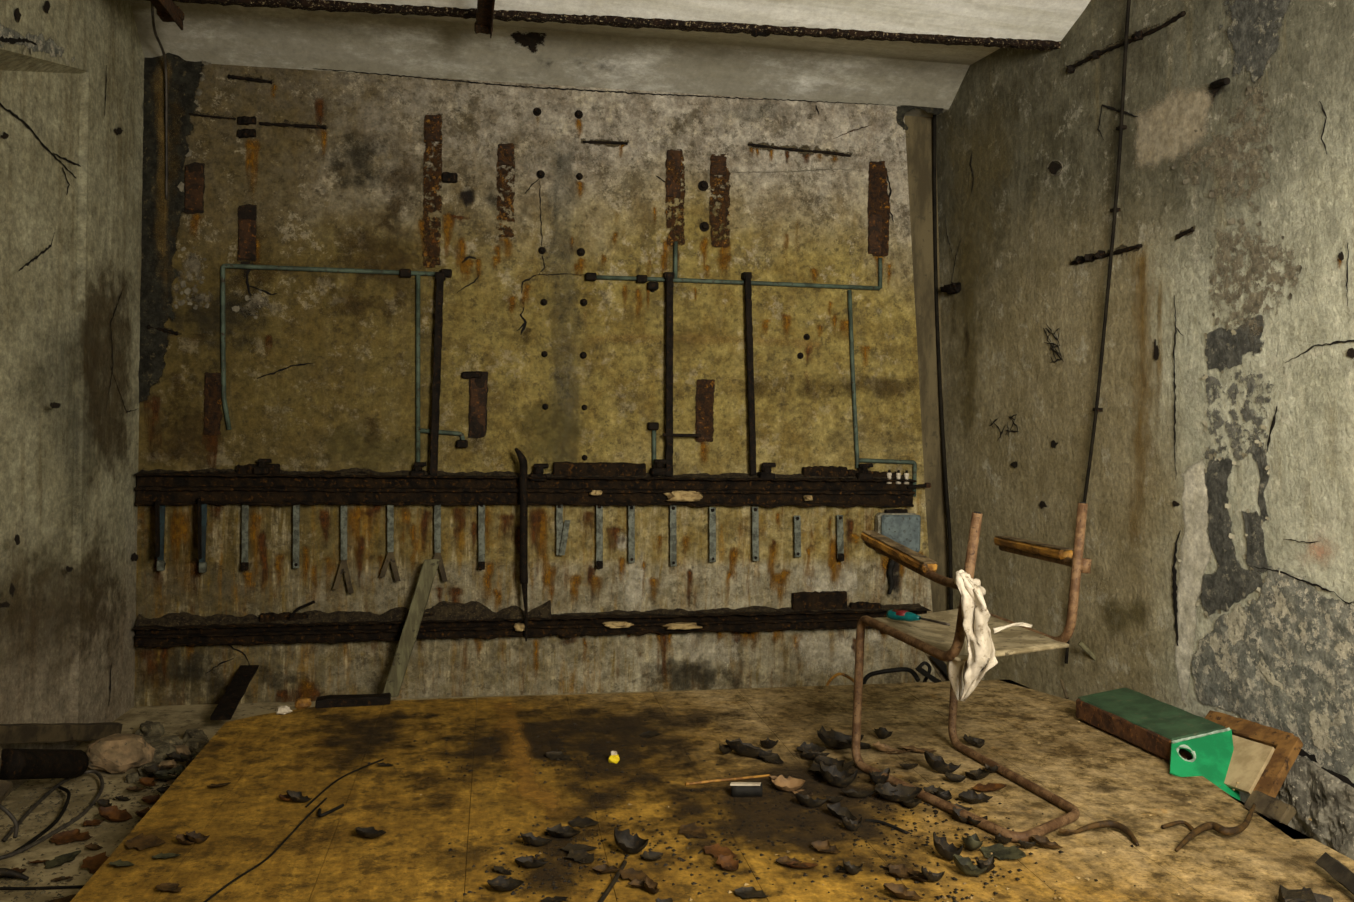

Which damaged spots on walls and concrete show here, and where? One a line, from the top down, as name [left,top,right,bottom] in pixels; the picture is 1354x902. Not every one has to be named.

peeling [1219,0,1291,83]
crack [1319,101,1327,154]
spalling [138,52,236,403]
crack [1343,243,1351,304]
crack [1285,340,1354,363]
peeling [1172,218,1354,775]
rust [243,511,284,587]
rust [453,508,600,598]
rust [583,512,625,577]
rust [727,547,738,591]
rust [768,540,791,598]
rust [829,519,860,580]